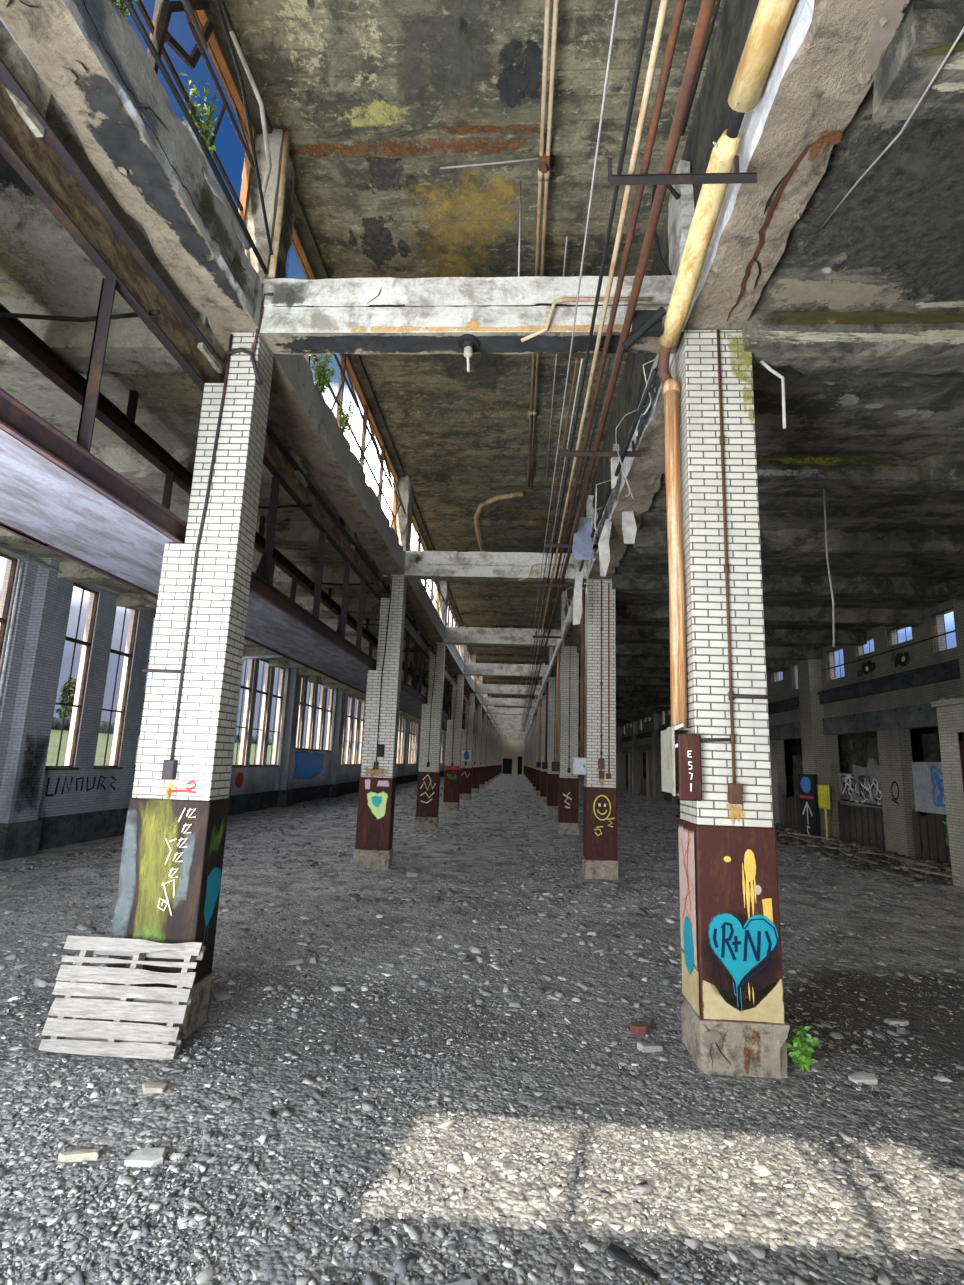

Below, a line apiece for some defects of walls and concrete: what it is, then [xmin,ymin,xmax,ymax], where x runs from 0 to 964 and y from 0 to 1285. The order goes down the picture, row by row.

leakage [343,0,543,127]
spalling [853,0,910,94]
leakage [190,170,303,317]
leakage [248,150,261,216]
corrosion [291,124,546,159]
leakage [408,171,517,277]
crack [727,133,837,321]
peeling [762,114,964,311]
leakage [745,320,964,345]
leakage [915,300,964,308]